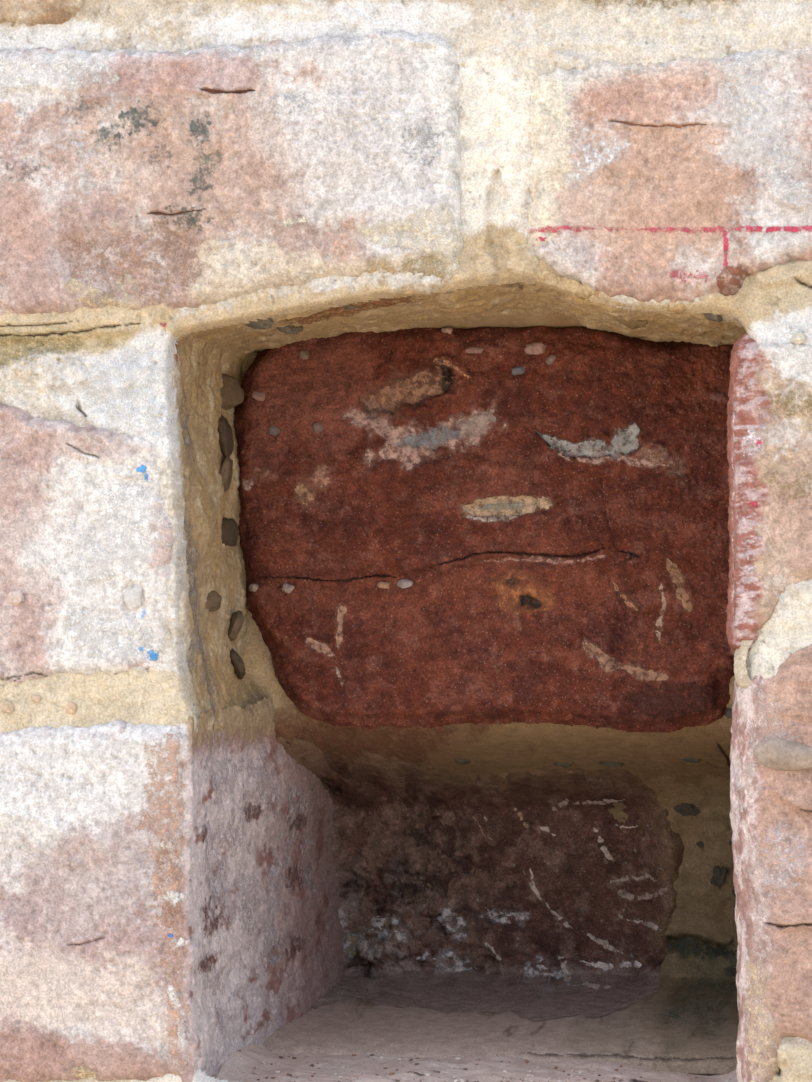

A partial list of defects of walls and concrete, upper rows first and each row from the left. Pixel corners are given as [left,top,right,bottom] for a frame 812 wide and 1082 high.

crack [202,87,255,95]
crack [616,120,704,128]
crack [149,208,201,216]
crack [437,484,639,565]
crack [262,574,397,582]